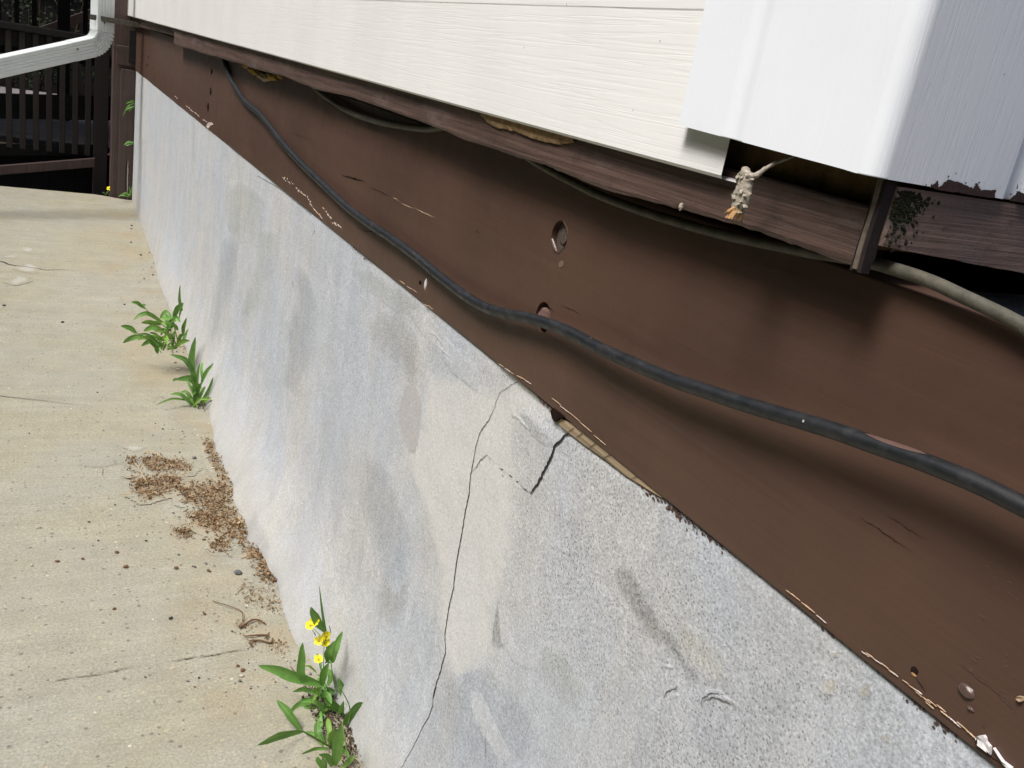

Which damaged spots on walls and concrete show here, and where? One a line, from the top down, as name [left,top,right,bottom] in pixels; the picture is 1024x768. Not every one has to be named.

spalling [550,398,605,445]
crack [403,381,569,765]
peeling [861,651,1013,768]